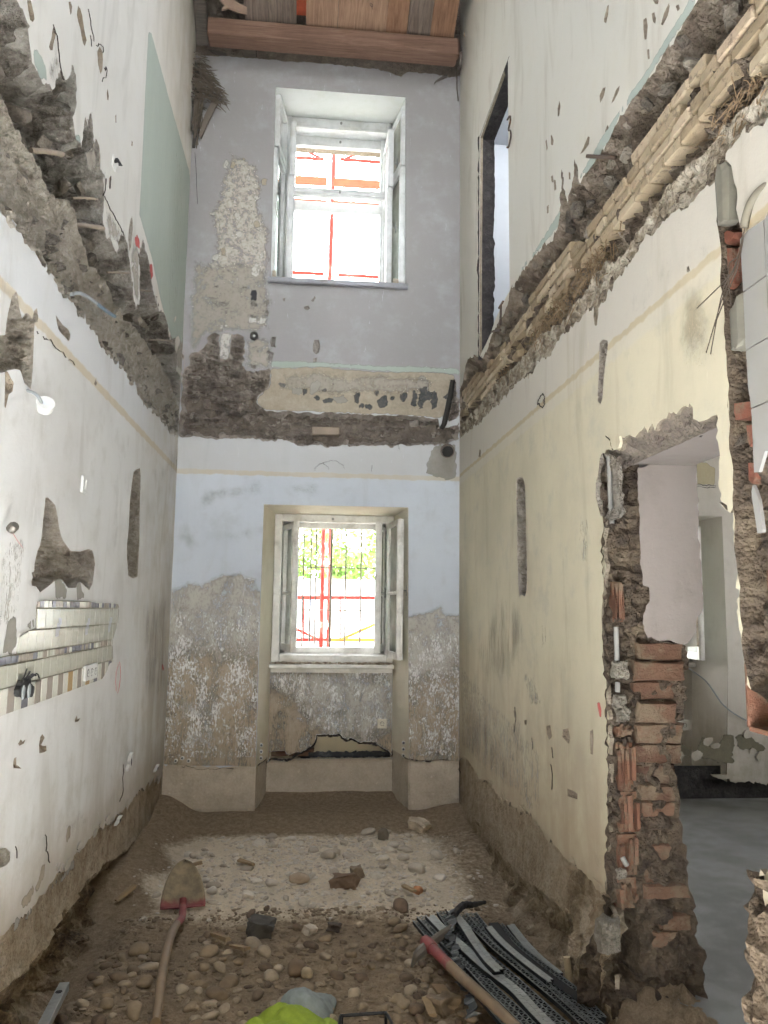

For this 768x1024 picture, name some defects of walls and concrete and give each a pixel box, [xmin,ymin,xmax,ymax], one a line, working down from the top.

flaking render [69,2,87,46]
flaking render [643,0,680,59]
peeling [86,139,110,189]
peeling [107,217,138,298]
spalling [460,78,768,438]
peeling [177,155,454,418]
flaking render [4,371,14,408]
flaking render [697,463,715,485]
crack [181,734,461,773]
flaking render [0,848,10,868]
peeling [14,865,45,931]